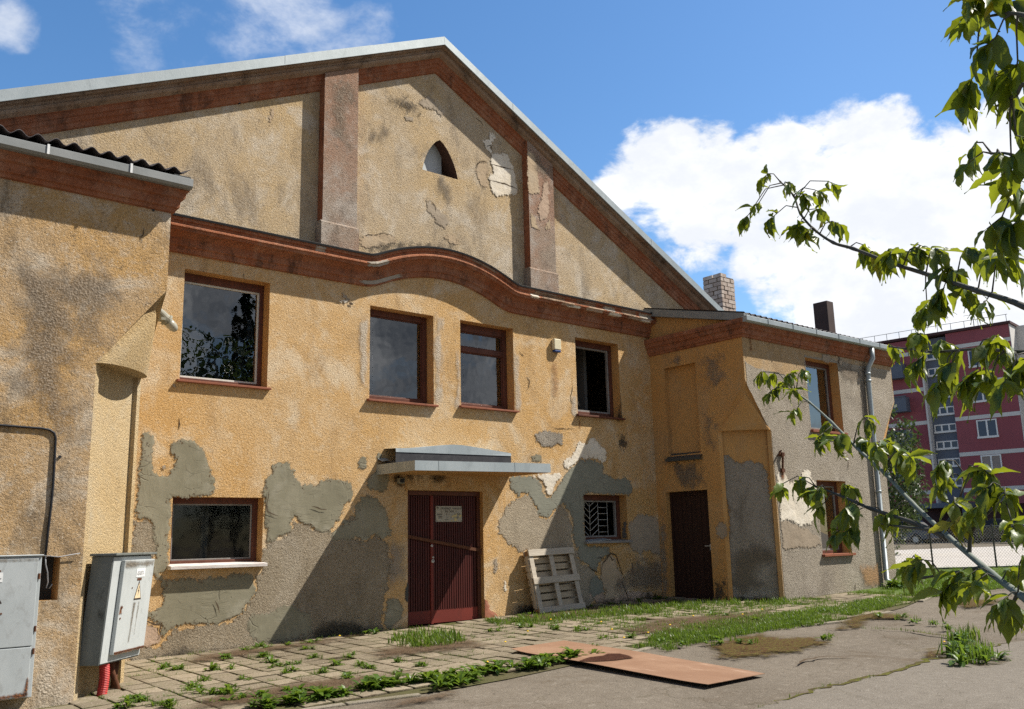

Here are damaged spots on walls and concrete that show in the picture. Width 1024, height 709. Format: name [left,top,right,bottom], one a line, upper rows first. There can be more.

peeling [483,132,551,230]
flaking render [130,519,395,661]
peeling [532,438,607,495]
flaking render [498,494,654,606]
flaking render [628,513,660,555]
flaking render [715,355,897,601]